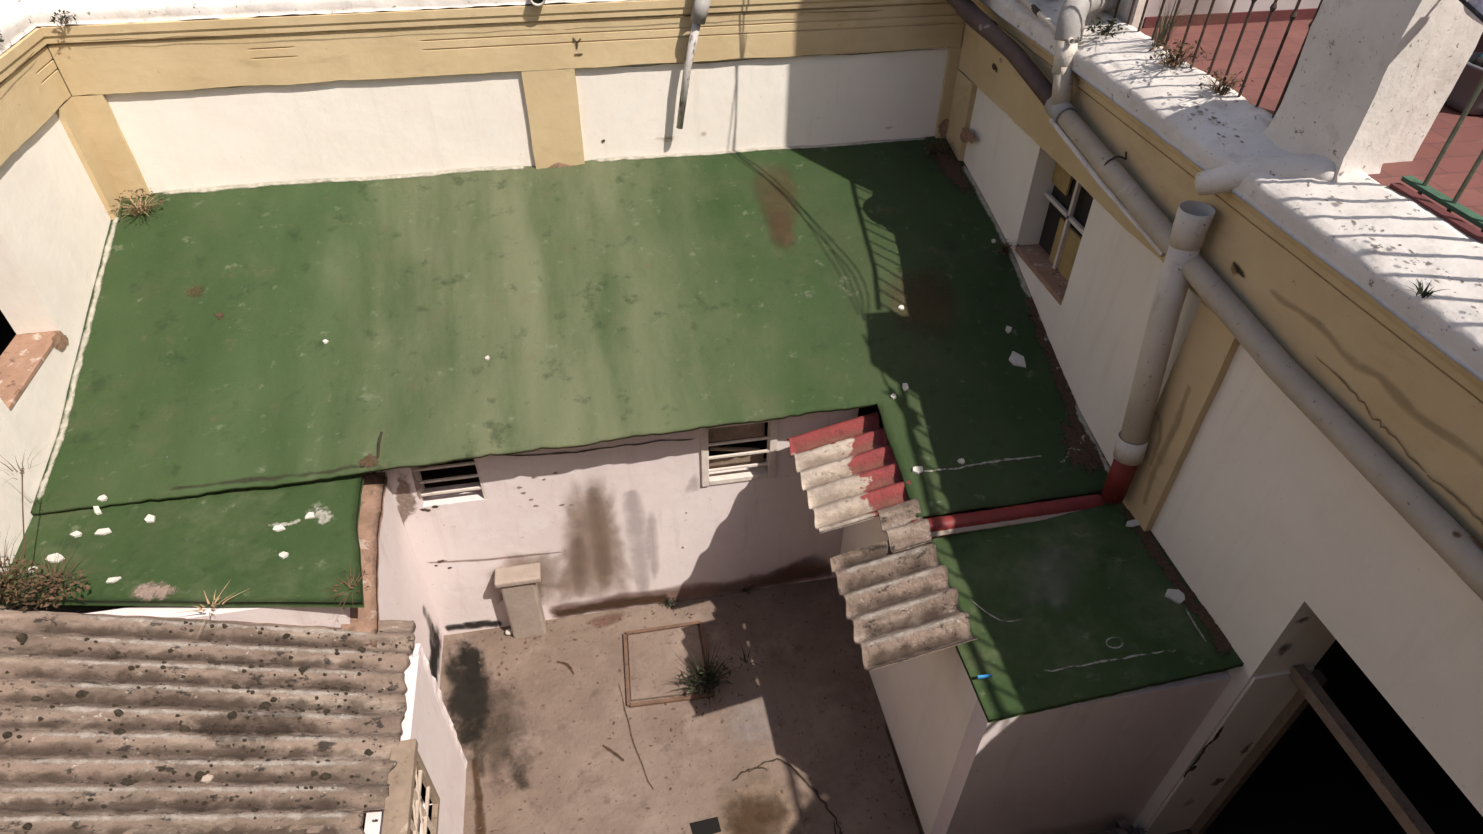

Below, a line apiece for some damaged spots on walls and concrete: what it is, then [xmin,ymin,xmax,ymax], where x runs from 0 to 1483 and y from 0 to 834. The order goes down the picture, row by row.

water stain [515,497,832,626]
water stain [423,607,523,834]